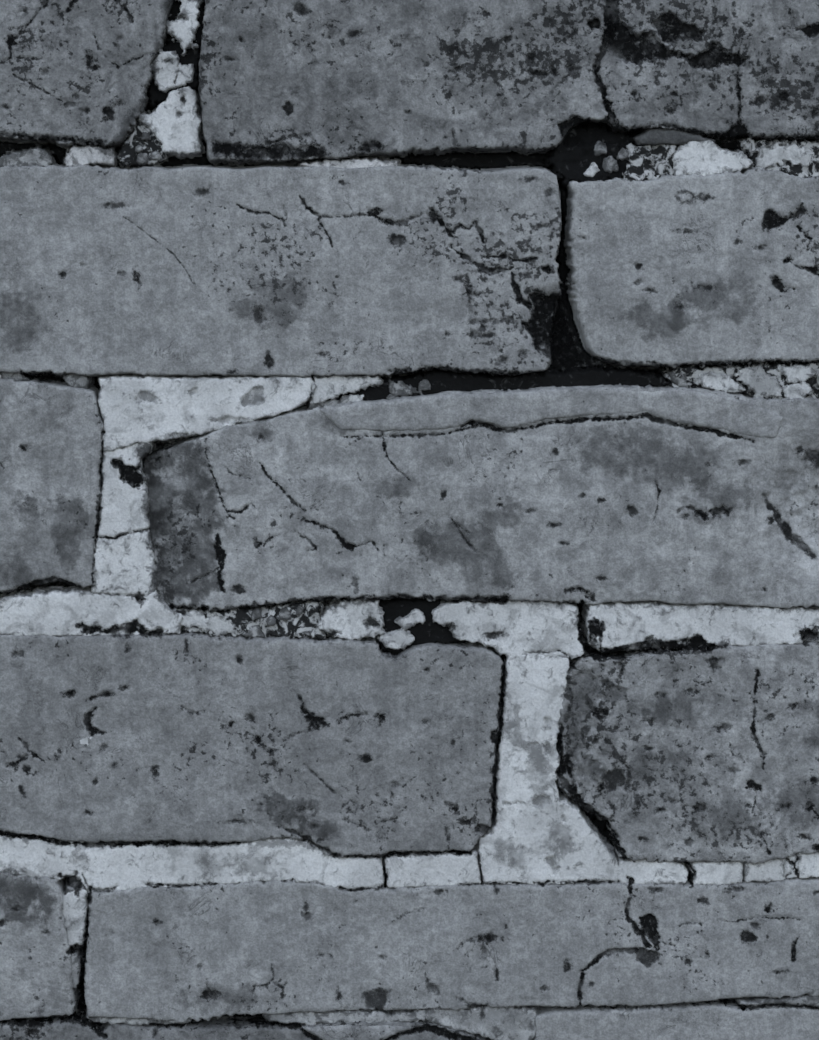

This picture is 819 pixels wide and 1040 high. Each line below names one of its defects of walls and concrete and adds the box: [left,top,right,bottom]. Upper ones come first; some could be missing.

crack [236,195,538,309]
crack [344,412,755,480]
crack [186,438,379,593]
crack [533,600,626,674]
crack [278,654,819,1012]
crack [0,830,247,1039]
crack [233,964,319,1040]
crack [385,1022,477,1040]